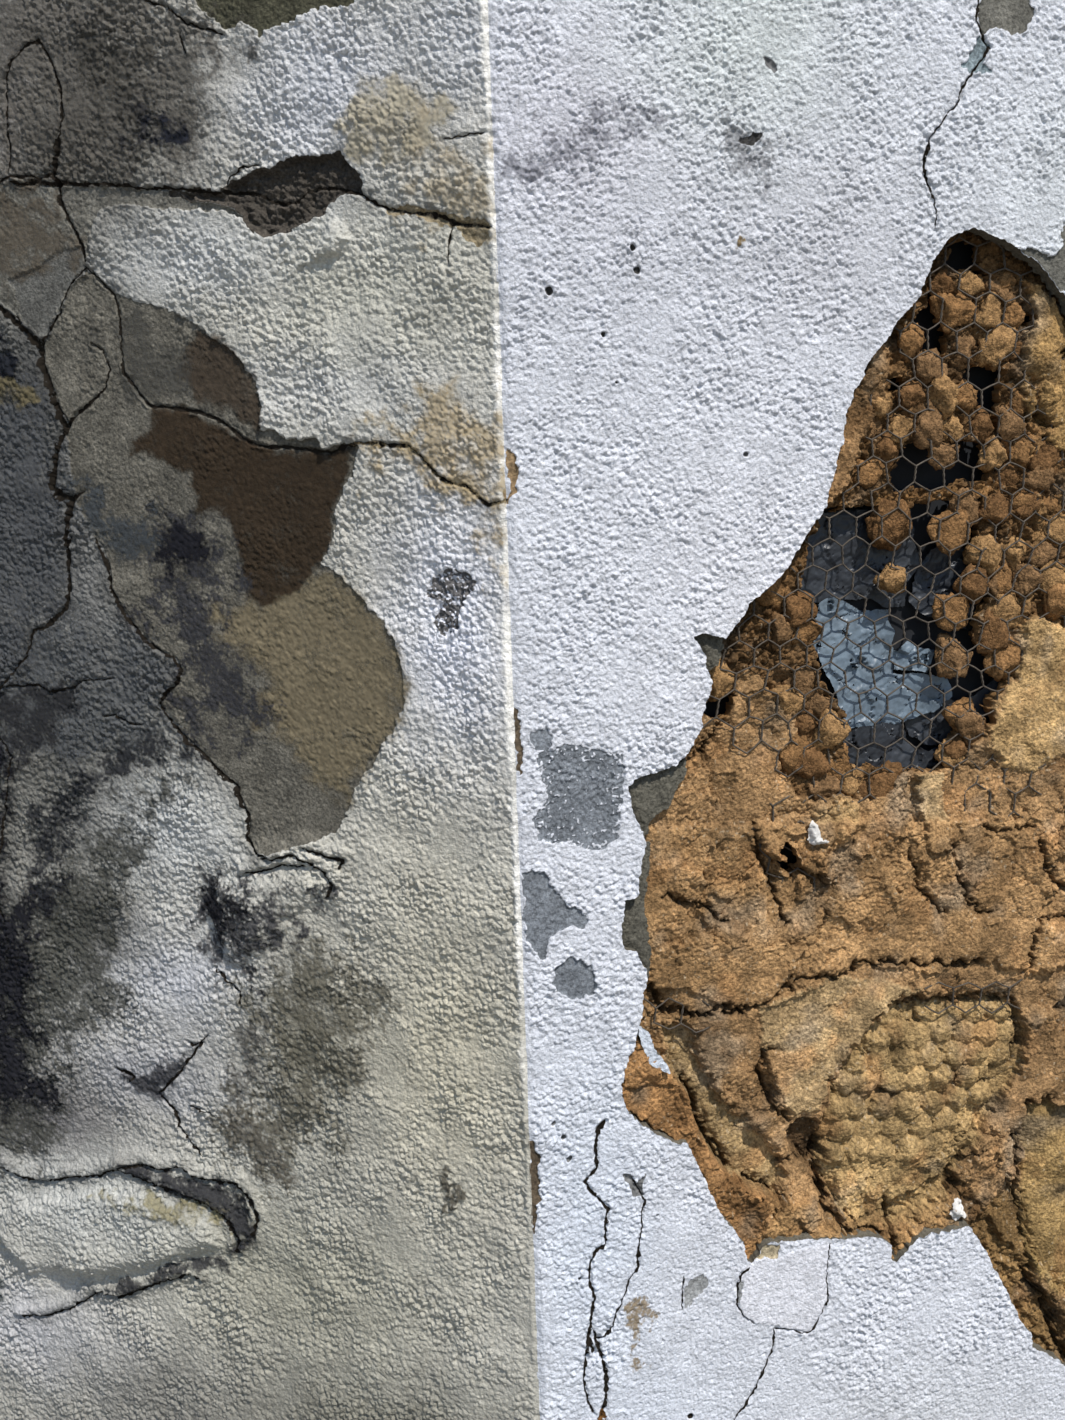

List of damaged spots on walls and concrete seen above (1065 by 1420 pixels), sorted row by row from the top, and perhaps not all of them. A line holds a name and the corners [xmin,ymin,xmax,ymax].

peeling [196,0,354,38]
spalling [738,132,763,146]
spalling [763,57,777,73]
crack [923,0,991,228]
peeling [961,0,1035,74]
peeling [0,150,405,856]
crack [0,38,508,857]
damp [0,305,410,1174]
flaking render [514,225,1065,1366]
crack [583,1120,646,1420]
crack [734,1244,830,1420]